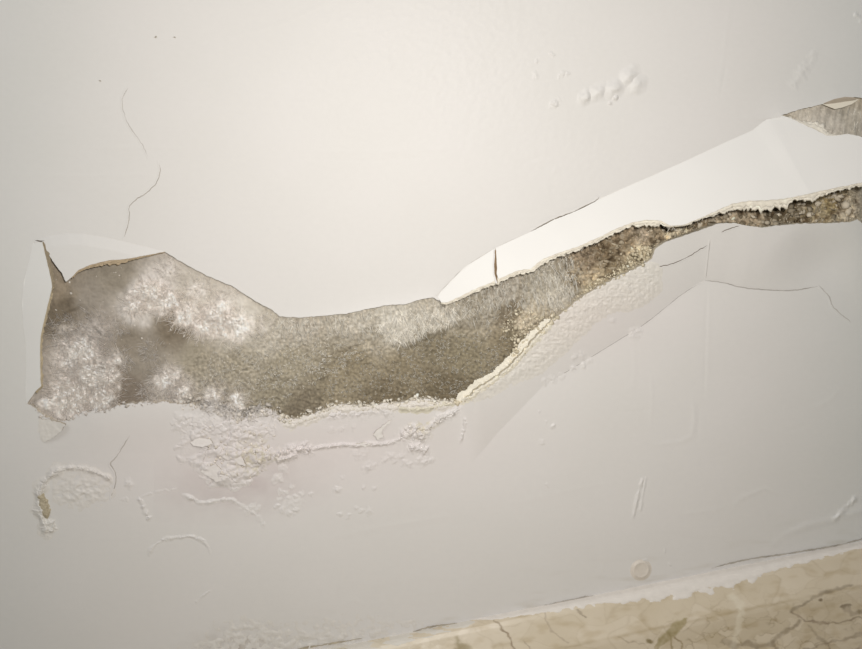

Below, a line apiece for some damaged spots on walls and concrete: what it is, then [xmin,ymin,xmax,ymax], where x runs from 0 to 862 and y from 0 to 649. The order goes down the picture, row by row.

crack [120,85,161,240]
flaking render [22,97,862,493]
crack [644,226,851,324]